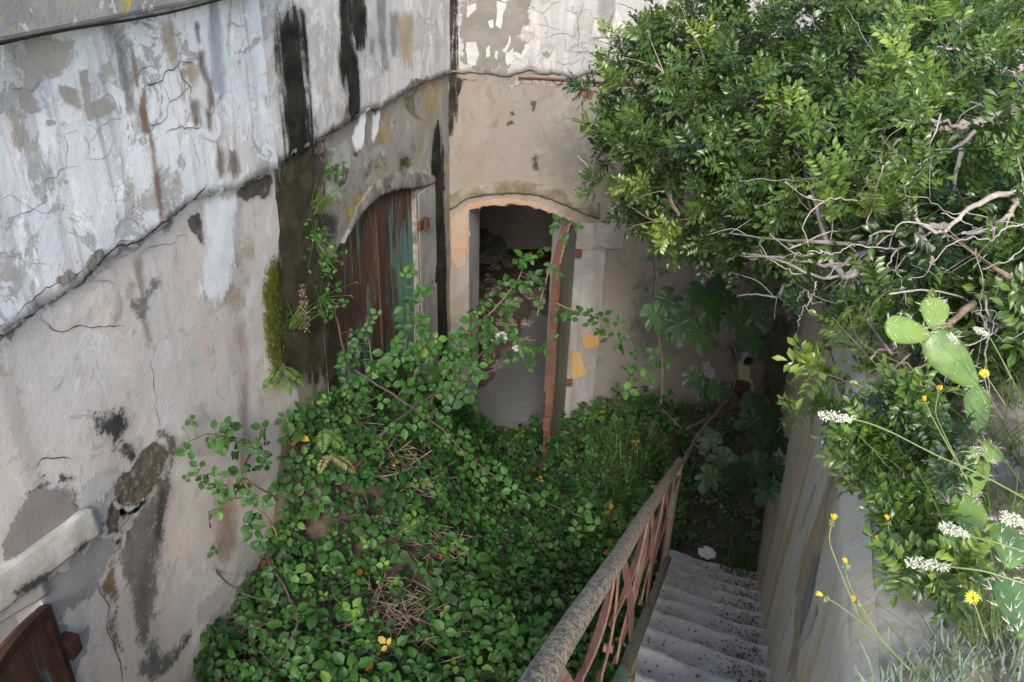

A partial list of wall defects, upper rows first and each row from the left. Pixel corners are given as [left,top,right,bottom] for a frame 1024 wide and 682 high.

peeling [11,34,116,152]
crack [9,56,200,228]
crack [16,186,212,333]
corrosion [131,43,163,219]
flaking render [187,213,205,245]
flaking render [236,173,273,201]
water stain [274,0,338,385]
water stain [339,0,412,156]
water stain [424,0,464,381]
peeling [457,0,627,94]
mould [93,404,136,463]
peeling [2,435,169,677]